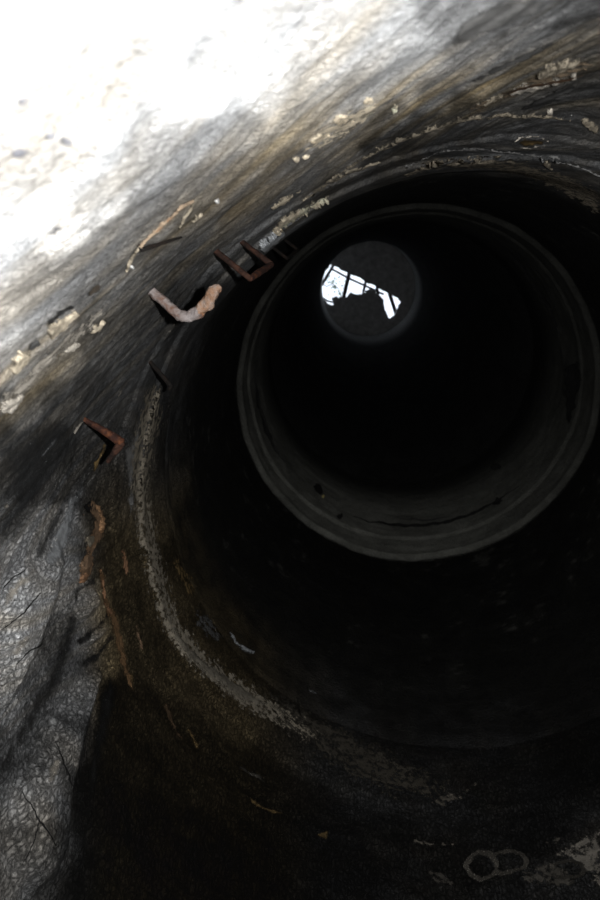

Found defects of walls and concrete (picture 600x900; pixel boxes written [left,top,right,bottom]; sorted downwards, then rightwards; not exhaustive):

flaking render [471,58,591,116]
water stain [13,149,33,158]
water stain [46,133,73,145]
peeling [292,97,377,163]
peeling [582,118,599,134]
water stain [403,155,600,213]
water stain [259,192,329,253]
flaking render [1,303,108,414]